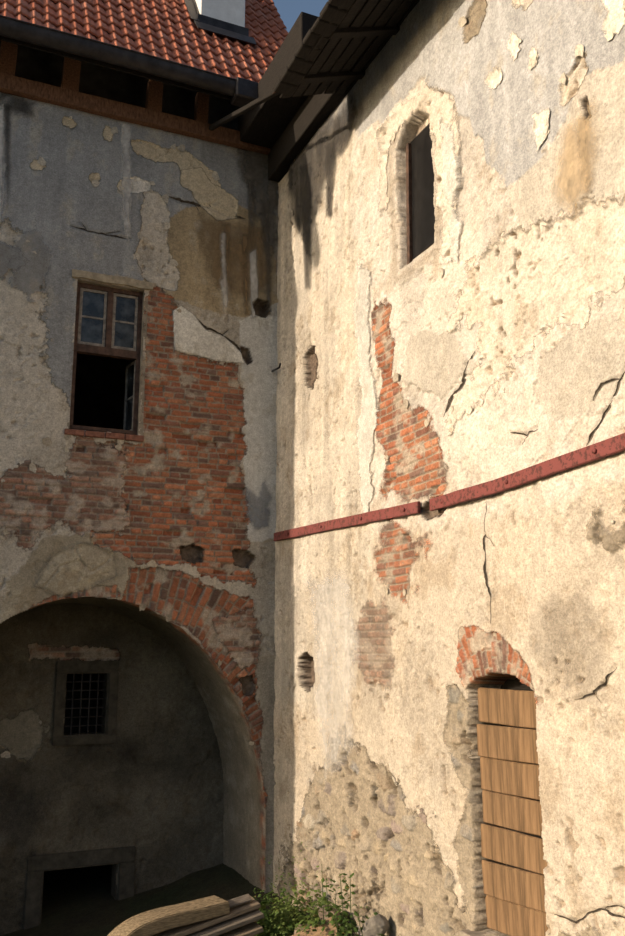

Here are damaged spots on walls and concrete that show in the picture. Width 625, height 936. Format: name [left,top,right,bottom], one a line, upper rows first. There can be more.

spalling [458,0,488,44]
flaking render [601,0,625,41]
flaking render [558,44,589,106]
leakage [0,93,33,191]
flaking render [130,139,238,221]
flaking render [376,84,460,277]
leakage [559,117,592,202]
flaking render [371,191,625,503]
crack [586,371,625,446]
flaking render [0,176,268,808]
crack [482,501,494,623]
crack [554,905,625,924]